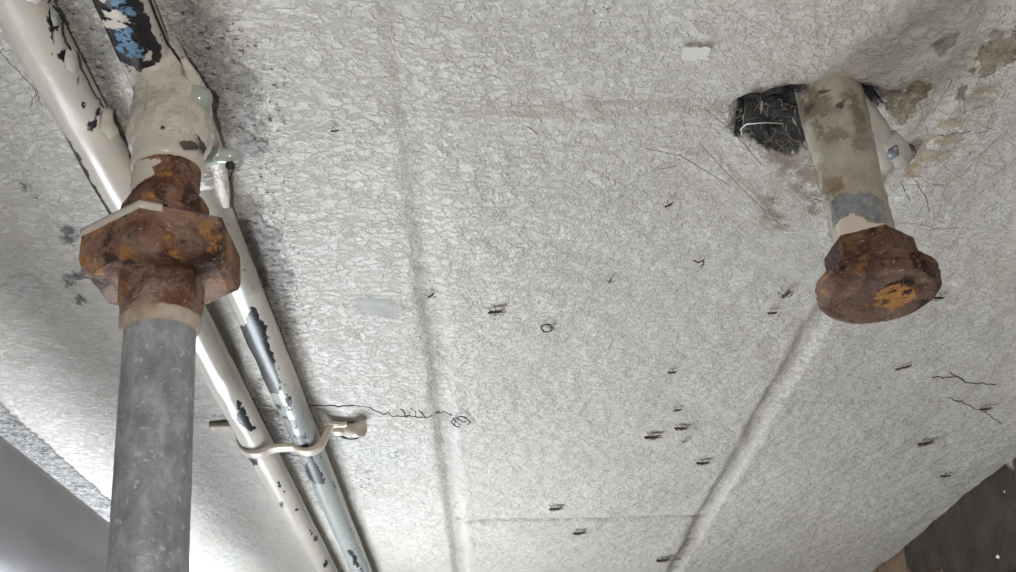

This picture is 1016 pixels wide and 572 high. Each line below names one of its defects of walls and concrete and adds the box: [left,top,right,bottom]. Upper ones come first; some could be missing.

peeling [933,33,958,57]
peeling [955,26,1016,101]
spalling [733,84,832,155]
peeling [861,80,934,126]